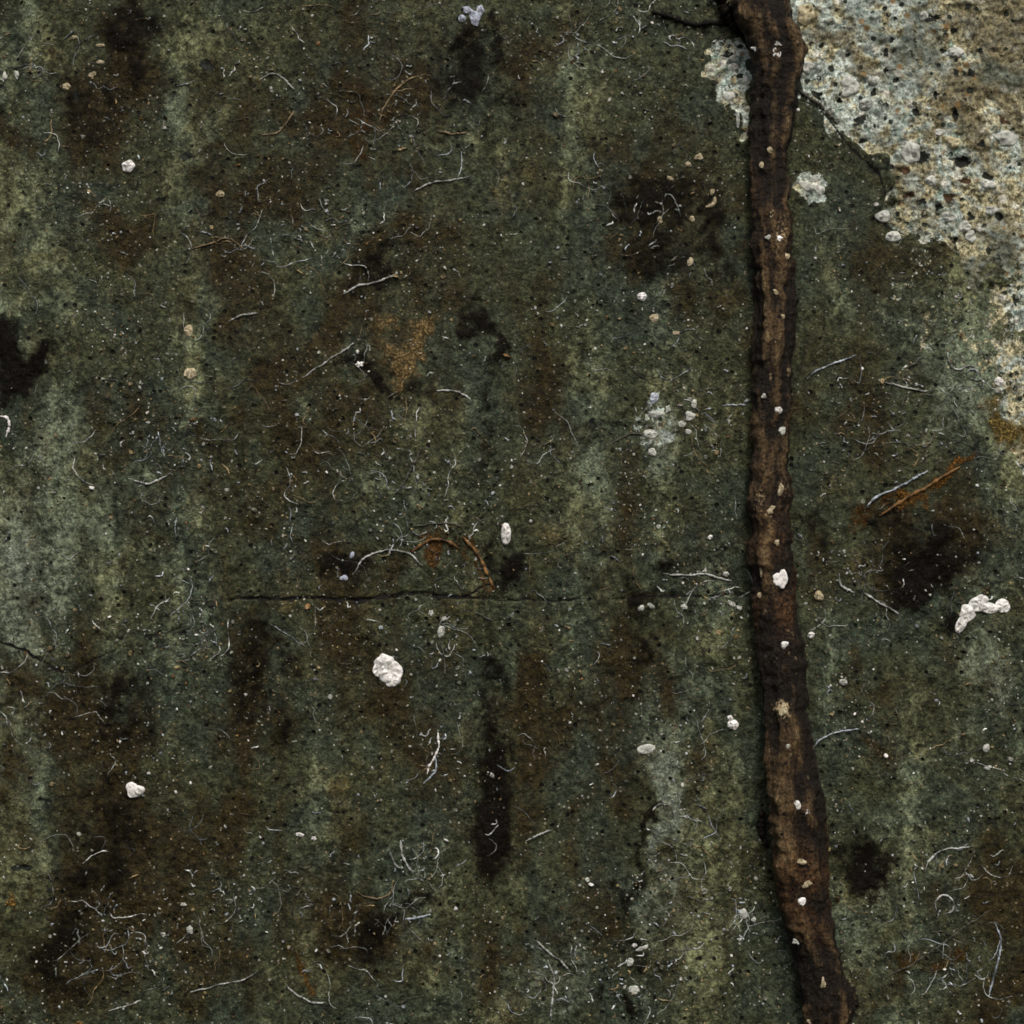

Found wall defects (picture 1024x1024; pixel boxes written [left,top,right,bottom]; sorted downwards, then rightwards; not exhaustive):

spalling [701,37,752,142]
crack [798,99,909,237]
damp [614,174,738,290]
spalling [791,0,1024,475]
damp [0,313,54,408]
corrosion [853,454,975,525]
crack [228,583,749,604]
damp [866,510,989,614]
damp [944,610,962,635]
damp [470,655,513,889]